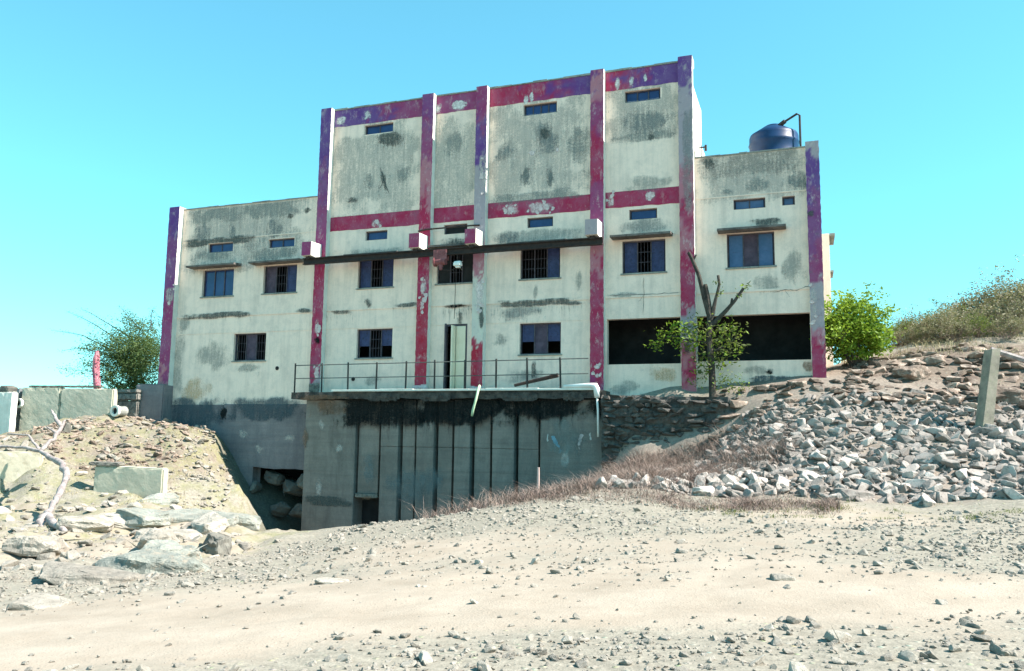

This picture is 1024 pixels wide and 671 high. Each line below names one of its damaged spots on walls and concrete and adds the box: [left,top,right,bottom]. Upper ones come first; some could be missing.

water stain [379,132,401,146]
peeling [503,200,555,215]
water stain [187,226,254,247]
peeling [418,277,428,314]
water stain [501,298,580,317]
water stain [174,382,299,427]
water stain [342,398,602,427]